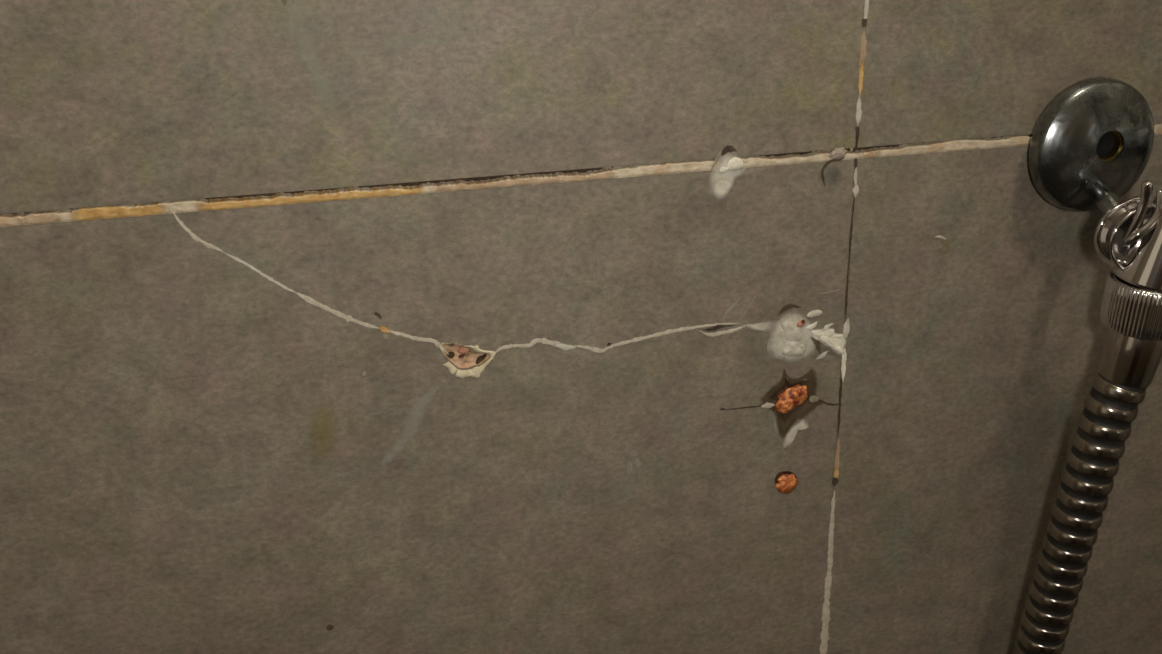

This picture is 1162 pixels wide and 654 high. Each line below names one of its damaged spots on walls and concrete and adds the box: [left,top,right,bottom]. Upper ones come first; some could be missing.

crack [168,209,449,354]
crack [489,293,757,355]
hole [439,343,496,378]
peeling [784,421,808,447]